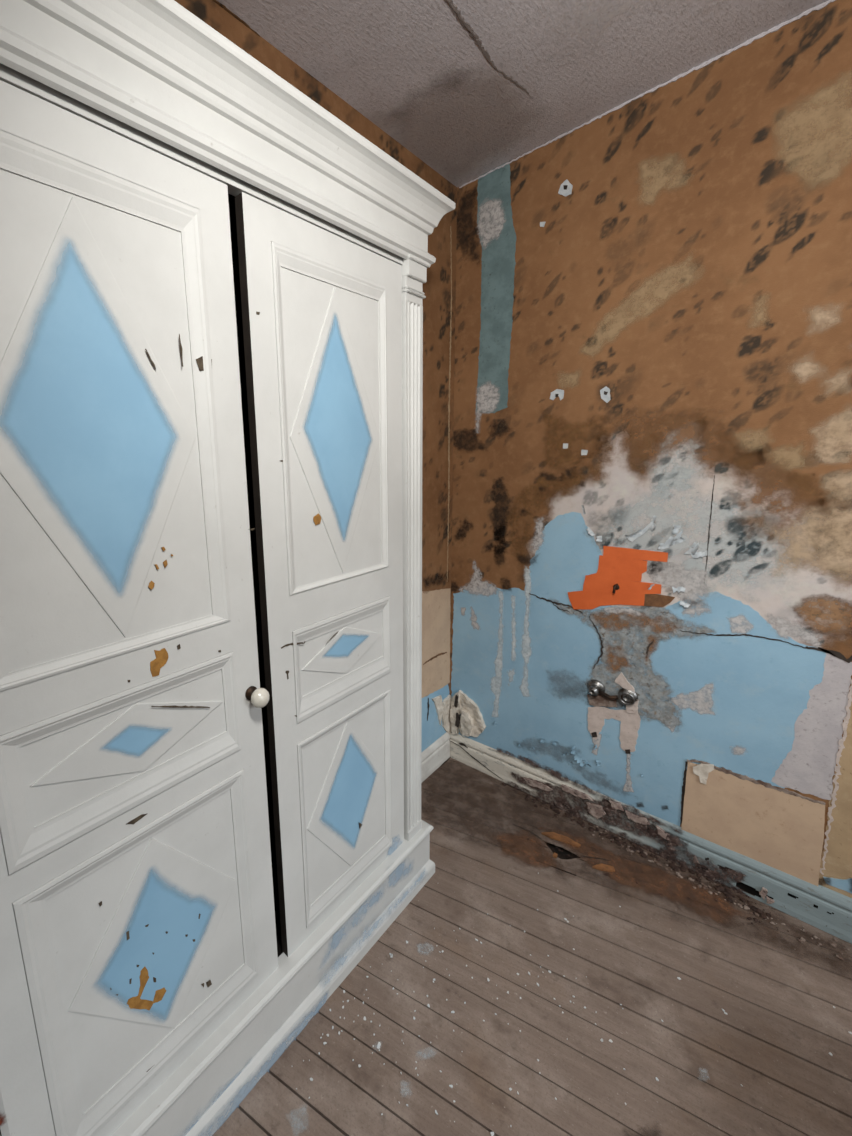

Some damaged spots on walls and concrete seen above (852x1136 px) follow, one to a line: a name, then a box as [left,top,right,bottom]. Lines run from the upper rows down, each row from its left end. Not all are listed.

crack [447,0,529,95]
water stain [453,430,484,451]
peeling [532,518,544,549]
water stain [486,411,852,717]
flaking render [422,561,497,698]
crack [529,593,604,669]
spalling [518,525,714,839]
flaking render [767,614,852,898]
spalling [542,844,583,874]